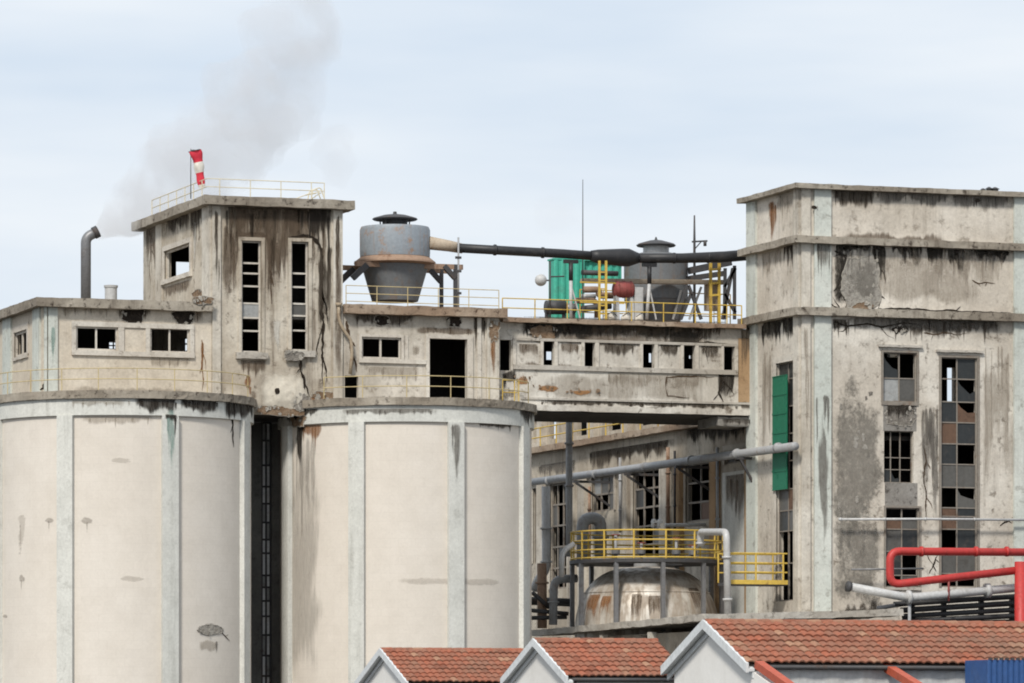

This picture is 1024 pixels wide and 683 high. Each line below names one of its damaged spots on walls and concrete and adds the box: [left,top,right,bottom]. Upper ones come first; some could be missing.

spalling [171,289,215,325]
damp [215,206,339,319]
crack [289,231,357,395]
spalling [840,253,882,309]
damp [817,244,1009,301]
crack [831,266,1010,340]
spalling [255,391,333,428]
spalling [197,623,224,636]